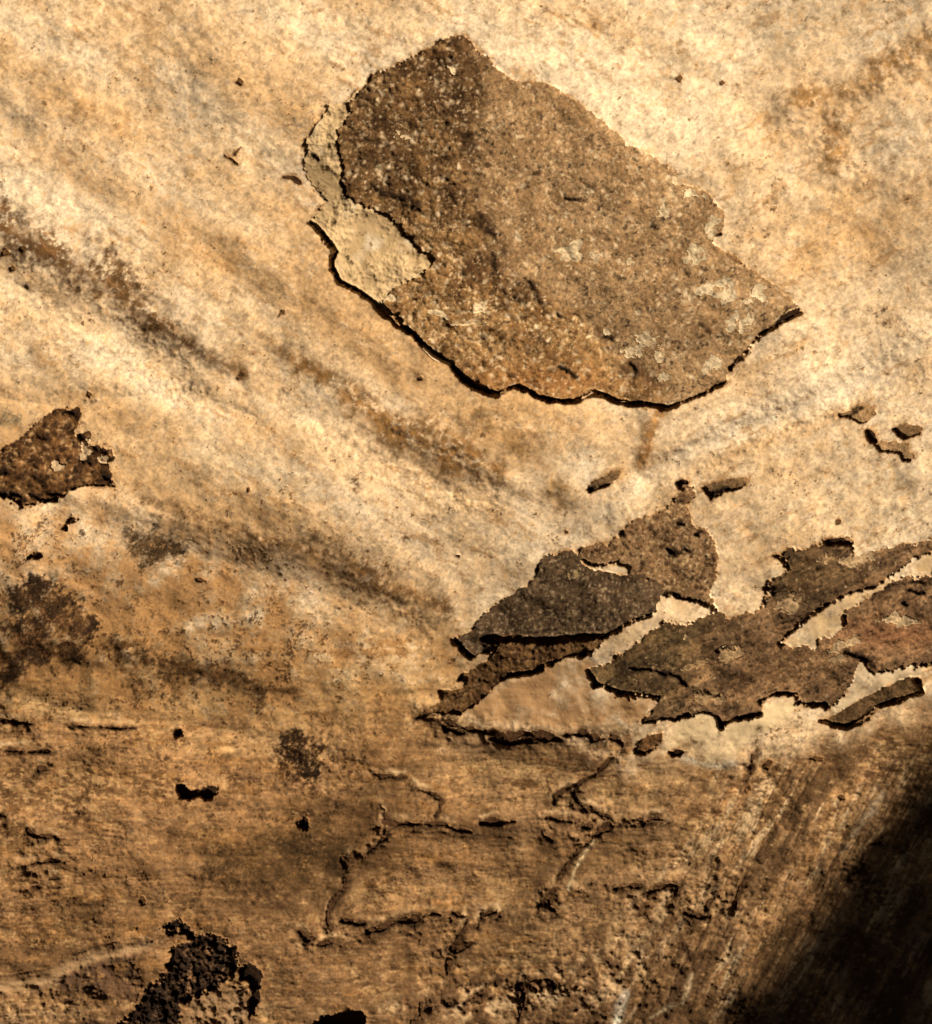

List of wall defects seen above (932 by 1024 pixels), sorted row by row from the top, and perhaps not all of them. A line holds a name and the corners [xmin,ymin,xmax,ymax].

flaking render [303,35,798,406]
flaking render [0,407,115,508]
flaking render [839,405,922,461]
flaking render [419,477,932,755]
crack [748,754,756,771]
crack [298,713,749,1024]
crack [850,831,890,877]
flaking render [120,918,242,1024]